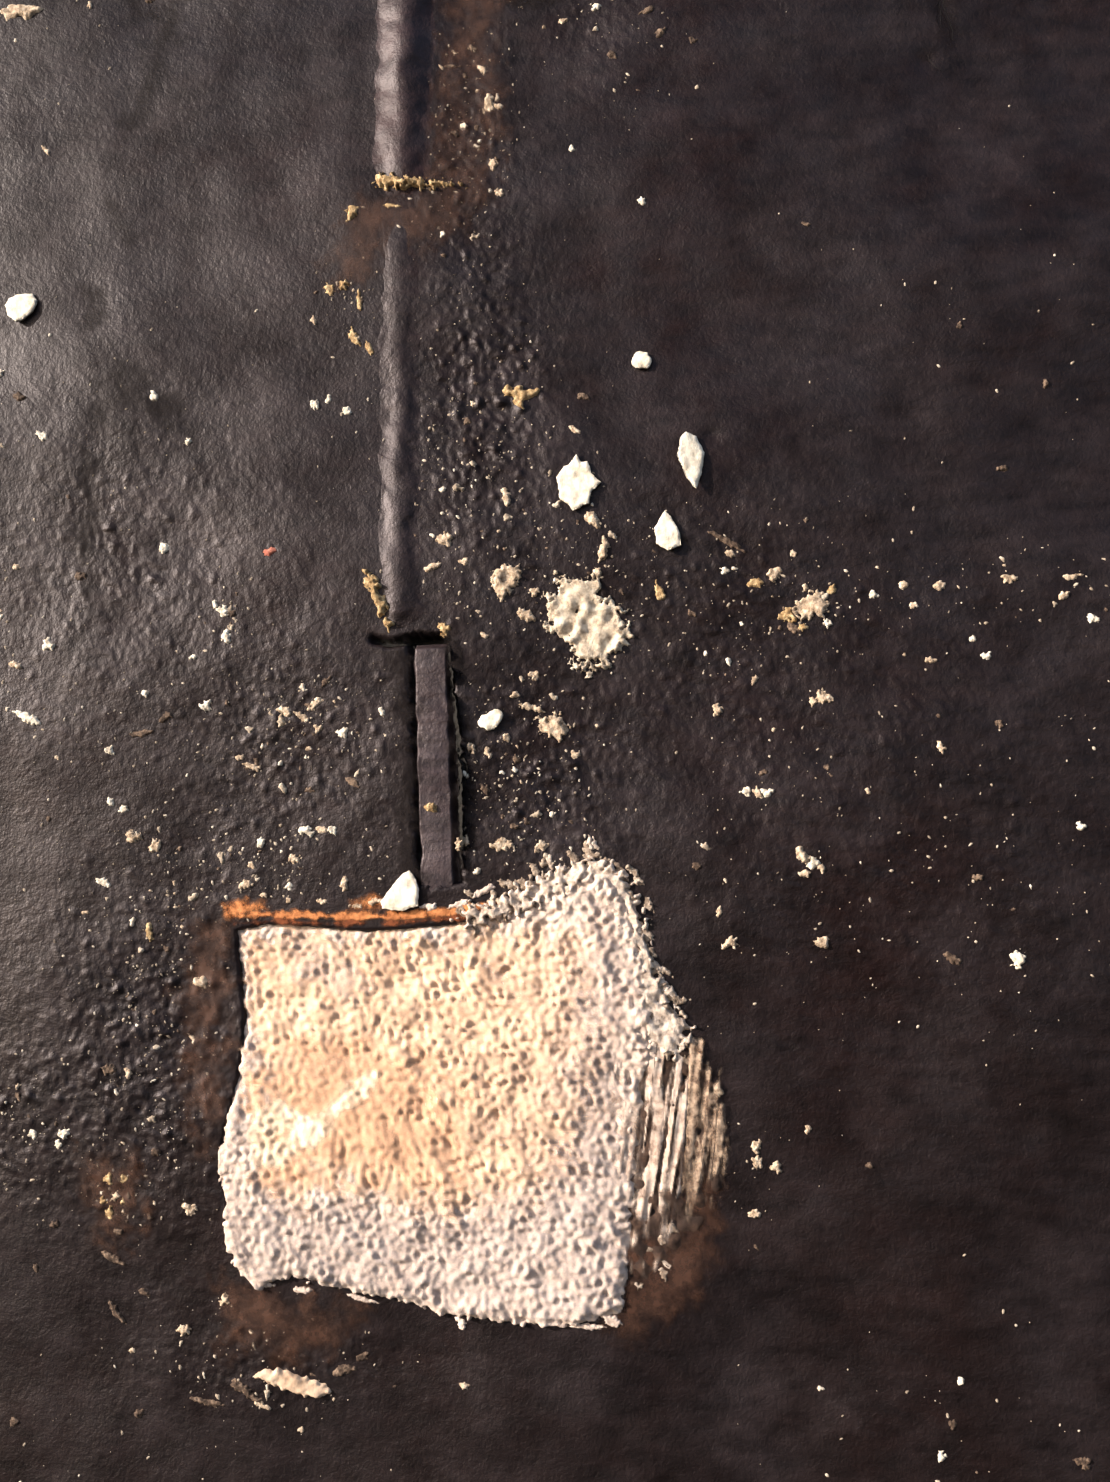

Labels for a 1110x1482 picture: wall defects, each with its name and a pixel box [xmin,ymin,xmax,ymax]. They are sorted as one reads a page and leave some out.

peeling [869,552,967,627]
peeling [969,537,1108,660]
spalling [0,0,881,1331]
crack [375,637,468,871]
rust [224,884,497,927]
peeling [937,951,963,966]
peeling [1000,950,1026,993]
peeling [1074,1457,1092,1470]